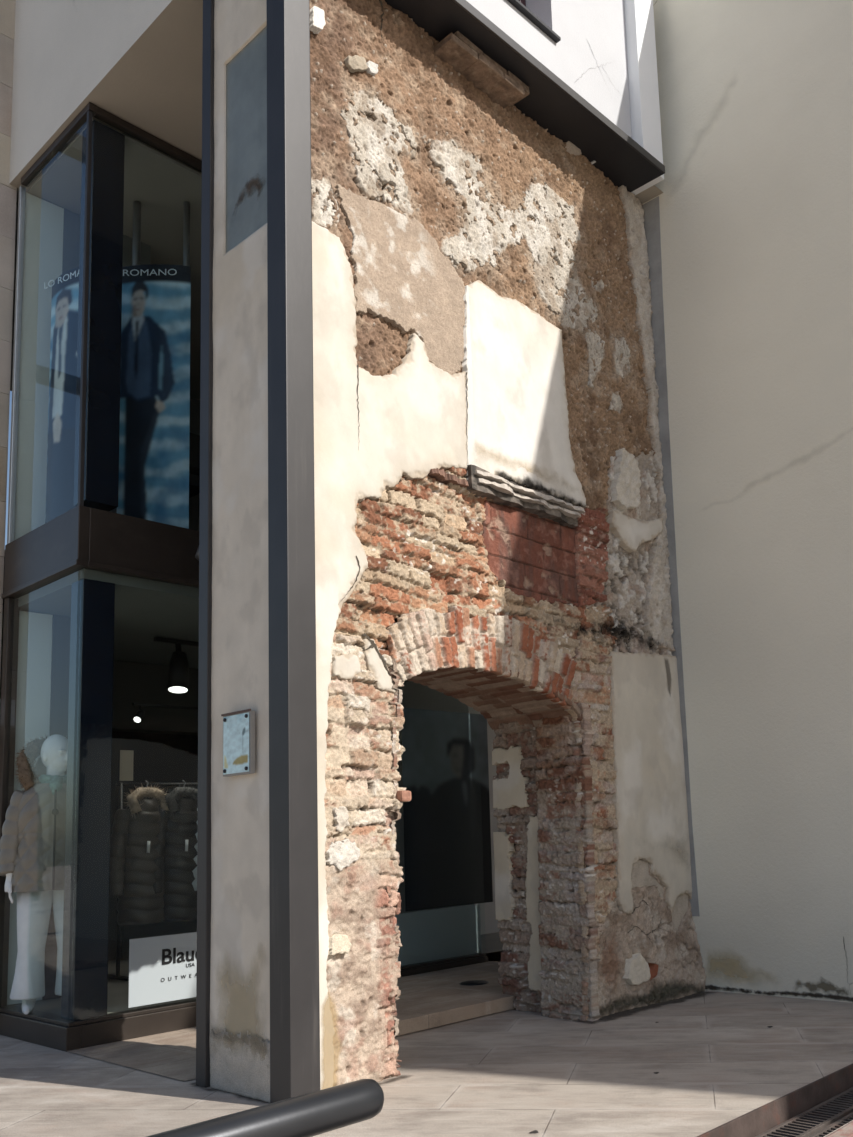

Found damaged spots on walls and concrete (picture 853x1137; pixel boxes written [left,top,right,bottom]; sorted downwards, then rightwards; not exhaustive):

spalling [310,0,658,545]
spalling [334,466,617,658]
spalling [597,859,706,1016]